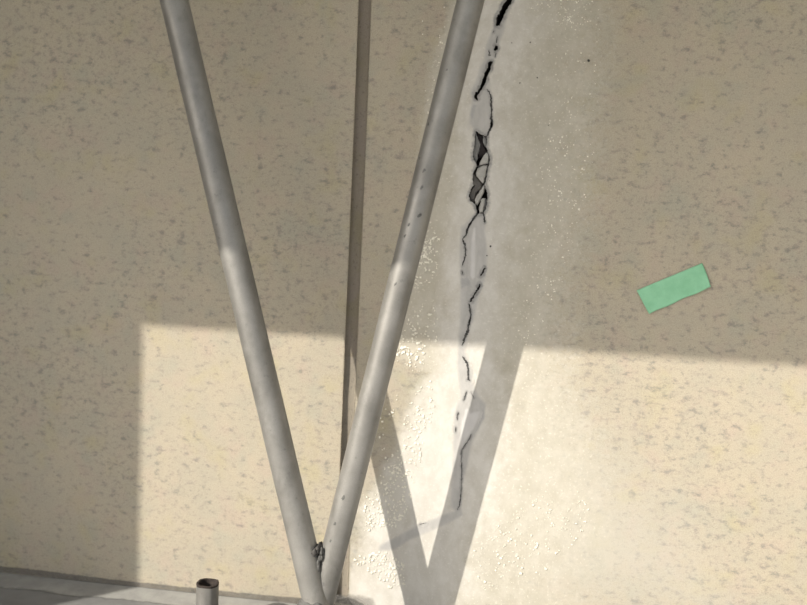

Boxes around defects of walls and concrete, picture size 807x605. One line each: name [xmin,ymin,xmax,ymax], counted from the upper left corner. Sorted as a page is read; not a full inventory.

crack [451,0,518,514]